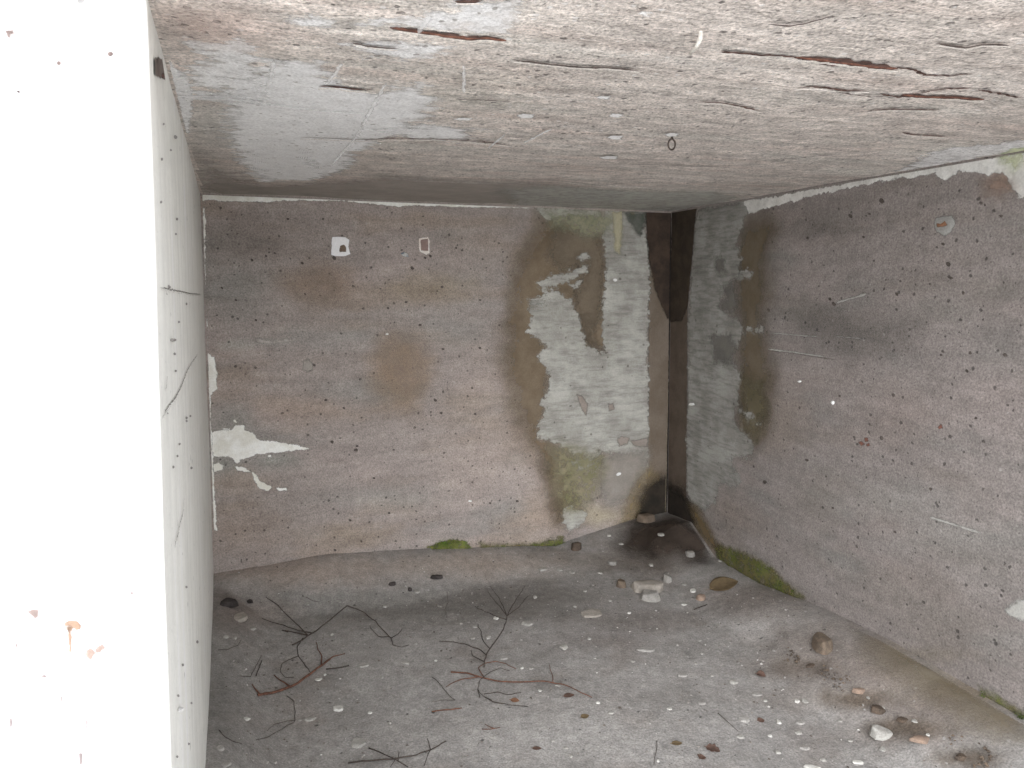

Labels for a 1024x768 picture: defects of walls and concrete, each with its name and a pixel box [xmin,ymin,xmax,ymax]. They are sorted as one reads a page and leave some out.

leakage [169,38,468,182]
crack [163,355,198,419]
peeling [207,341,309,531]
peeling [202,195,651,473]
peeling [562,505,587,530]
leakage [503,187,733,562]
leakage [736,219,775,446]
peeling [685,153,1024,511]